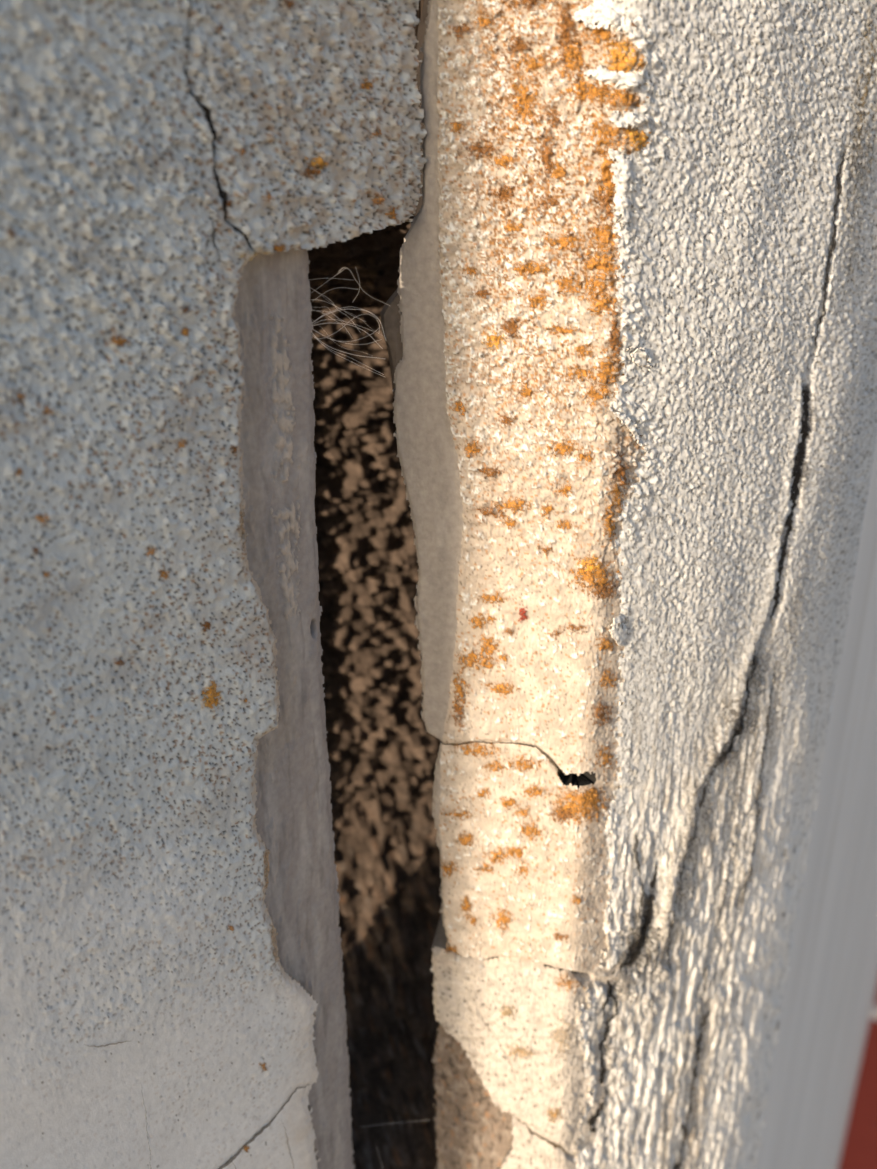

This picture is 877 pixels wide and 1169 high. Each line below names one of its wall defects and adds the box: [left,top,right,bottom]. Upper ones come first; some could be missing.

crack [185,0,253,256]
corrosion [483,318,521,351]
corrosion [504,0,651,410]
crack [815,153,845,348]
crack [307,0,558,1169]
corrosion [452,592,527,726]
corrosion [475,496,572,530]
crack [770,387,810,619]
corrosion [473,786,607,878]
crack [588,658,776,1133]
damp [656,643,795,966]
spalling [432,1021,513,1169]